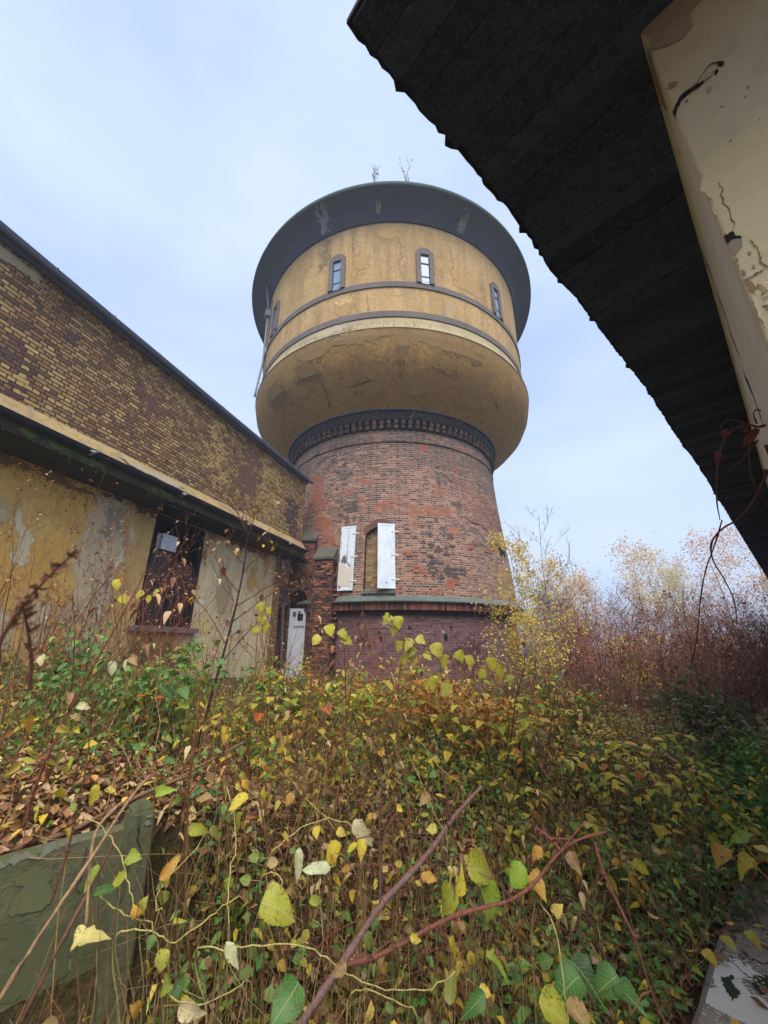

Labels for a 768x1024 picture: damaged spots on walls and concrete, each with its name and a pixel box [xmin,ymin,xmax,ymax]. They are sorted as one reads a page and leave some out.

crack [672,62,717,119]
flaking render [723,231,768,328]
flaking render [0,484,139,662]